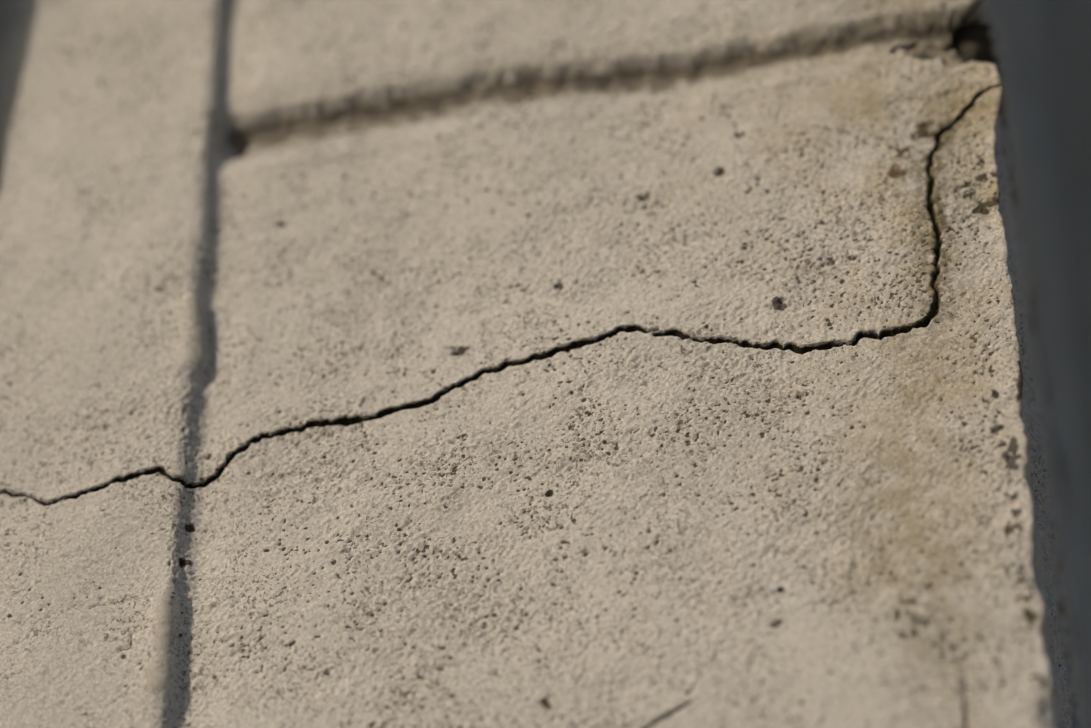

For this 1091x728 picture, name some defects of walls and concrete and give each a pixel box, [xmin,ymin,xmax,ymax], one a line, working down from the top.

crack [1,86,998,506]
crack [961,669,969,728]